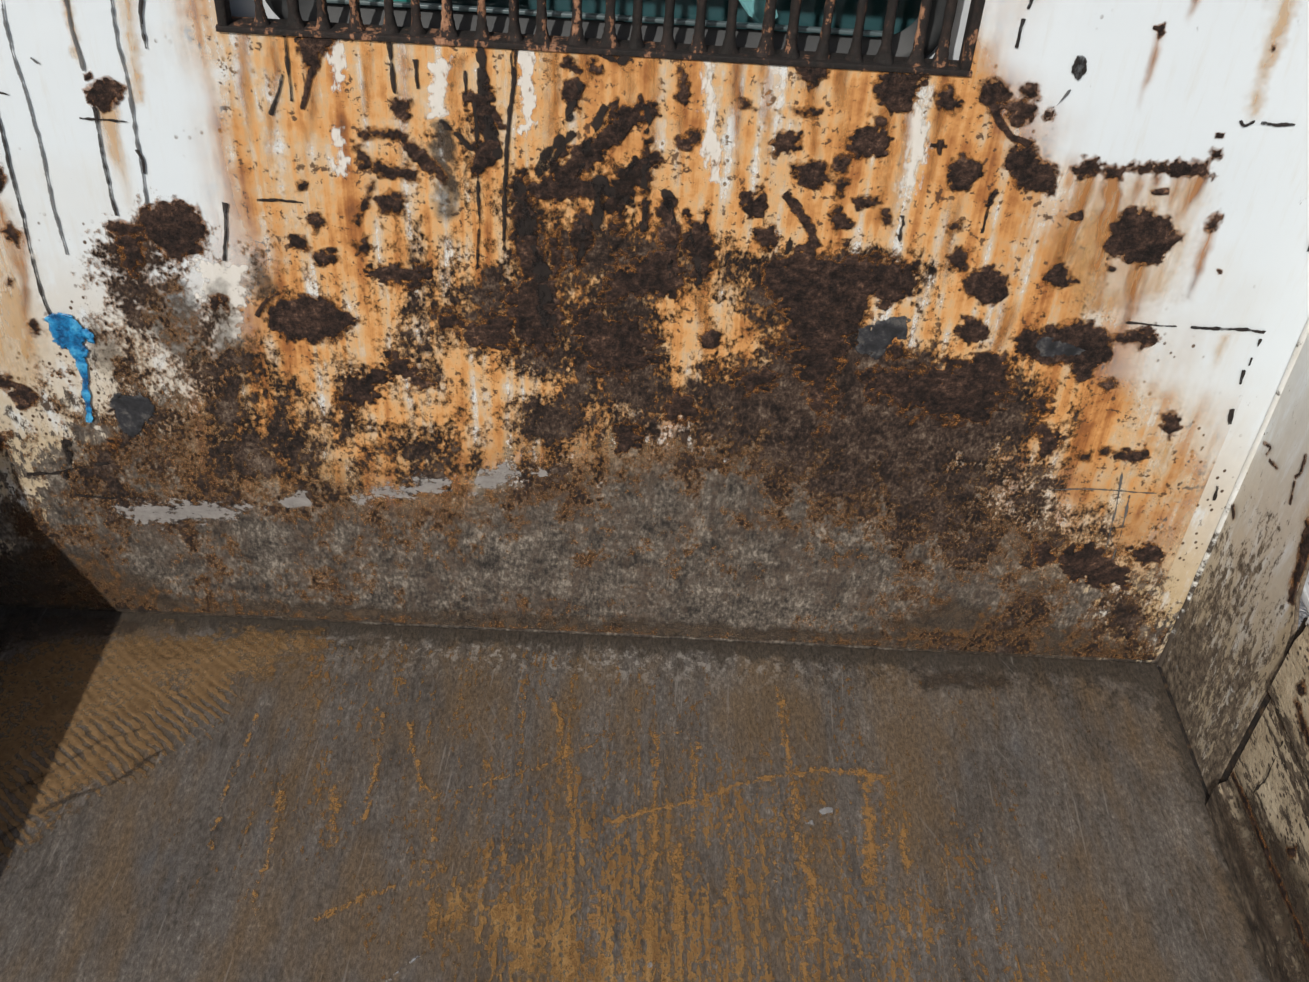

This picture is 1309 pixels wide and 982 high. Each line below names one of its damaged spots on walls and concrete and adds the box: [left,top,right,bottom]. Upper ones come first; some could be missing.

rust [189,0,1225,548]
rust [0,619,1120,982]